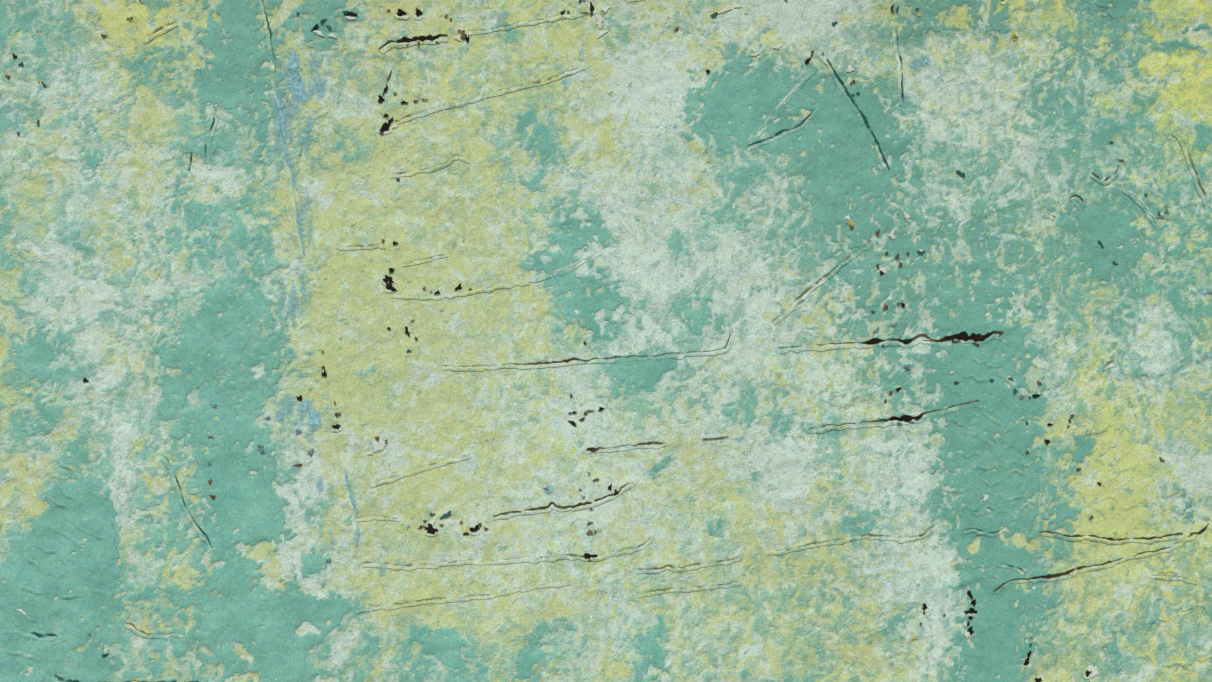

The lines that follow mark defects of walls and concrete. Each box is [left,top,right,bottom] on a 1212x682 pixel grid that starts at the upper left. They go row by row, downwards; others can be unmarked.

crack [747,107,820,151]
crack [442,332,736,371]
crack [778,331,1003,354]
crack [809,400,980,434]
crack [586,441,666,455]
crack [493,482,635,520]
crack [355,507,1212,614]
crack [18,632,57,641]
crack [125,622,183,639]
crack [50,674,80,682]
crack [124,674,199,682]